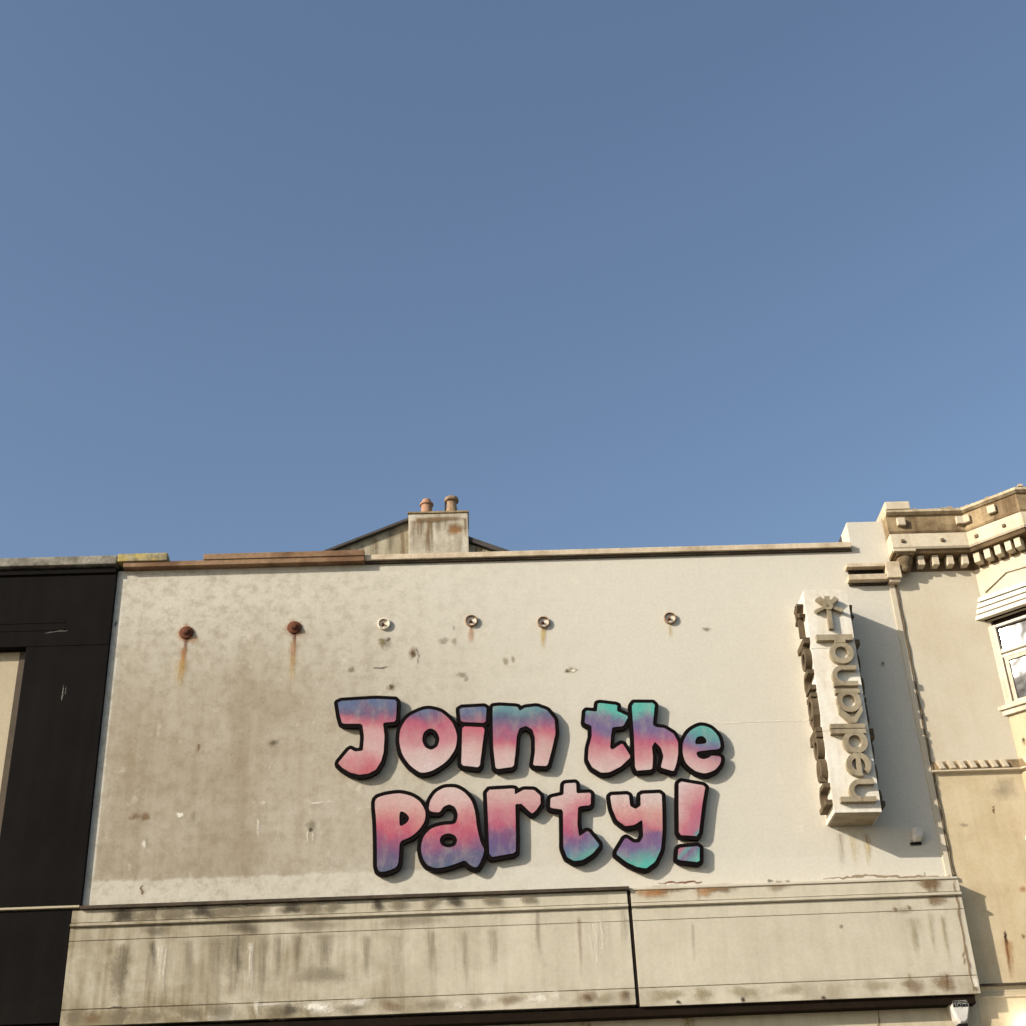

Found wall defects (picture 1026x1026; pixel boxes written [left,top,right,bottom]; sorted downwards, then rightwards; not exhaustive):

water stain [375,517,466,554]
water stain [922,880,940,902]
water stain [113,905,261,922]
water stain [282,902,340,913]